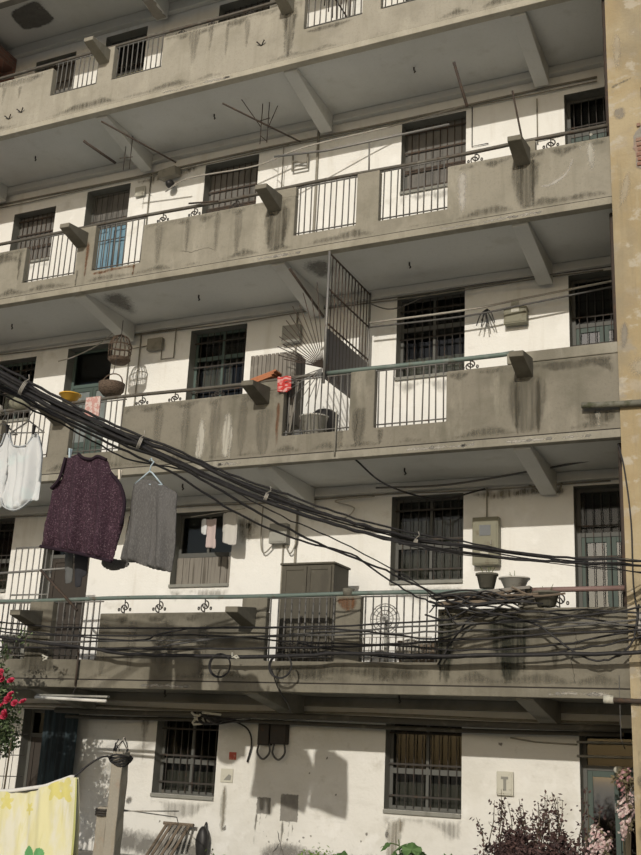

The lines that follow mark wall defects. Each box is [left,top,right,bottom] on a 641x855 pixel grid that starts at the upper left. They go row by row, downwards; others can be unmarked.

leakage [12,2,54,29]
flaking render [632,123,641,169]
leakage [510,377,540,430]
leakage [195,420,204,458]
leakage [222,415,233,457]
leakage [439,616,452,671]
leakage [490,617,526,678]